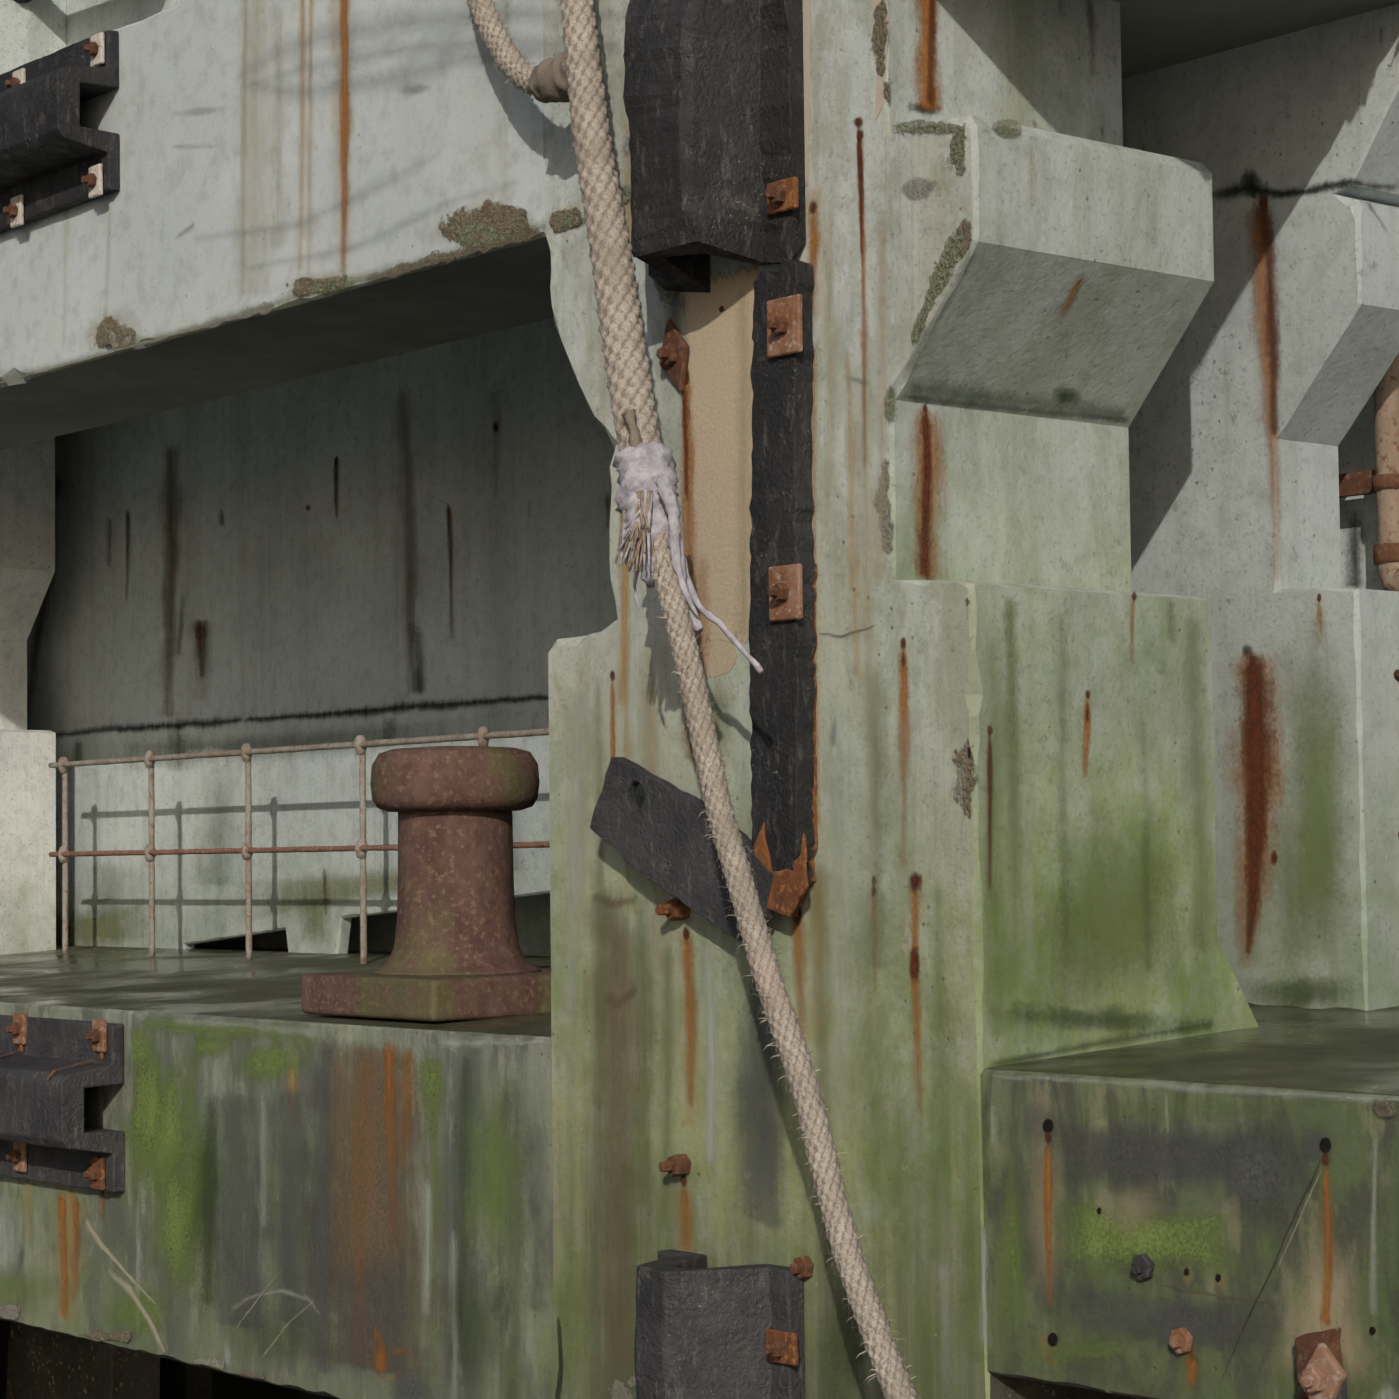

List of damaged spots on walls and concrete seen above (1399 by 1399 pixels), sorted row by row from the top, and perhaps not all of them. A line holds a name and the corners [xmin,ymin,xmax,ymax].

corrosion [340,0,349,245]
corrosion [915,0,940,113]
spalling [0,199,583,383]
corrosion [1253,195,1277,448]
leakage [164,451,177,676]
corrosion [917,404,940,577]
corrosion [1239,646,1280,952]
corrosion [910,873,922,1049]
leakage [132,1031,161,1159]
leakage [109,1272,165,1353]
leakage [154,1139,255,1326]
crack [555,1318,563,1399]